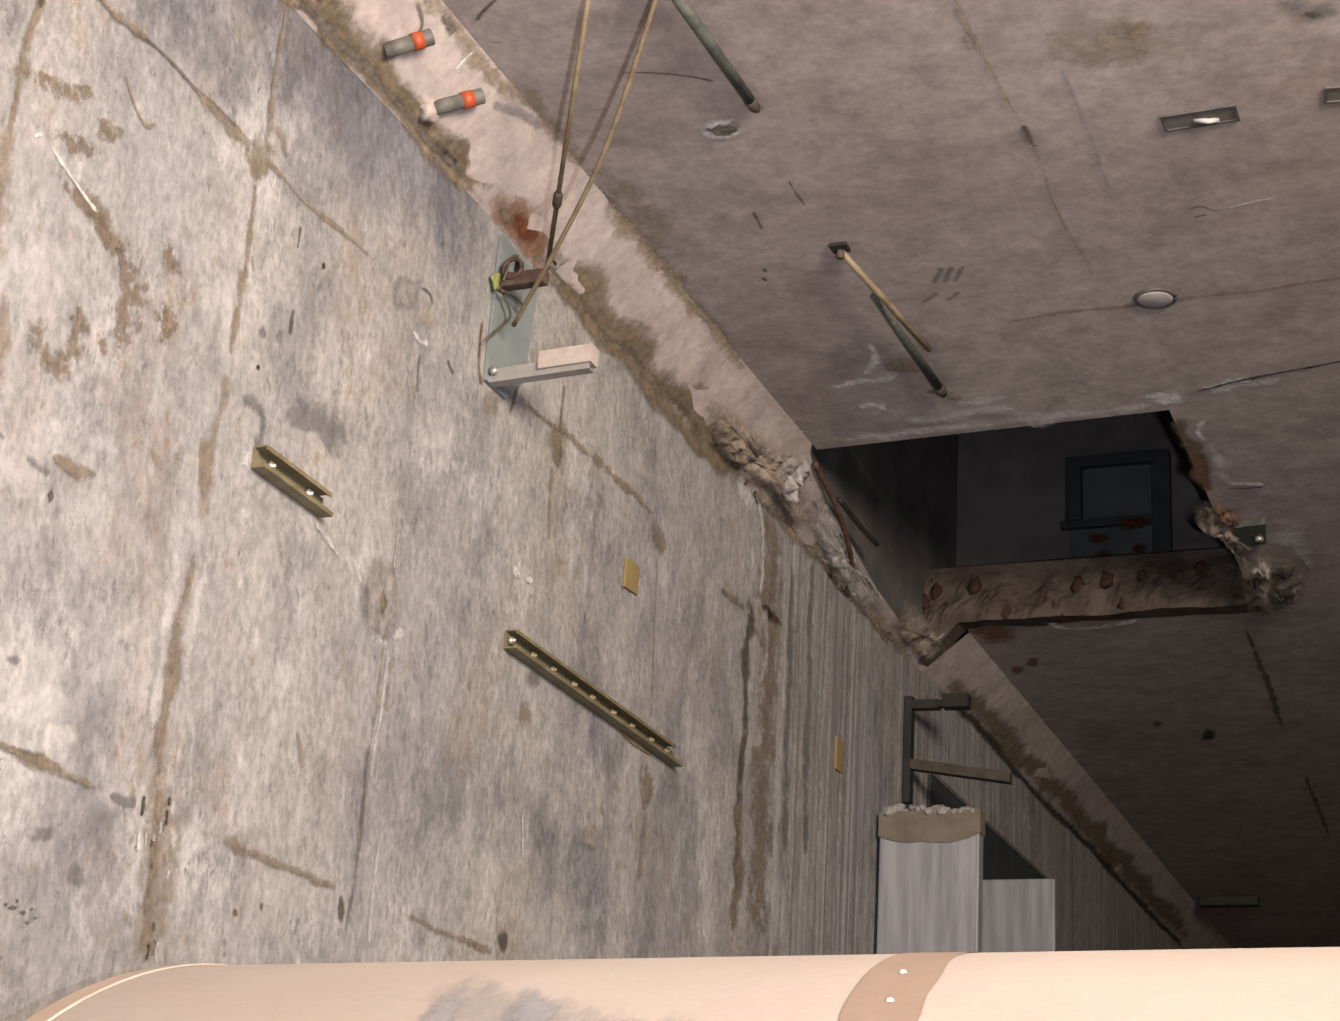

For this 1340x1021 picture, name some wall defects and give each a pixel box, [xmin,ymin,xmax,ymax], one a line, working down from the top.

crack [101,0,367,254]
damp [230,0,478,353]
damp [425,0,583,164]
rust [493,200,549,264]
crack [955,1,1093,274]
damp [849,390,1182,441]
crack [1197,361,1340,393]
damp [543,259,918,929]
spalling [812,461,879,569]
crack [0,741,136,807]
crack [225,837,344,920]
damp [951,682,1188,949]